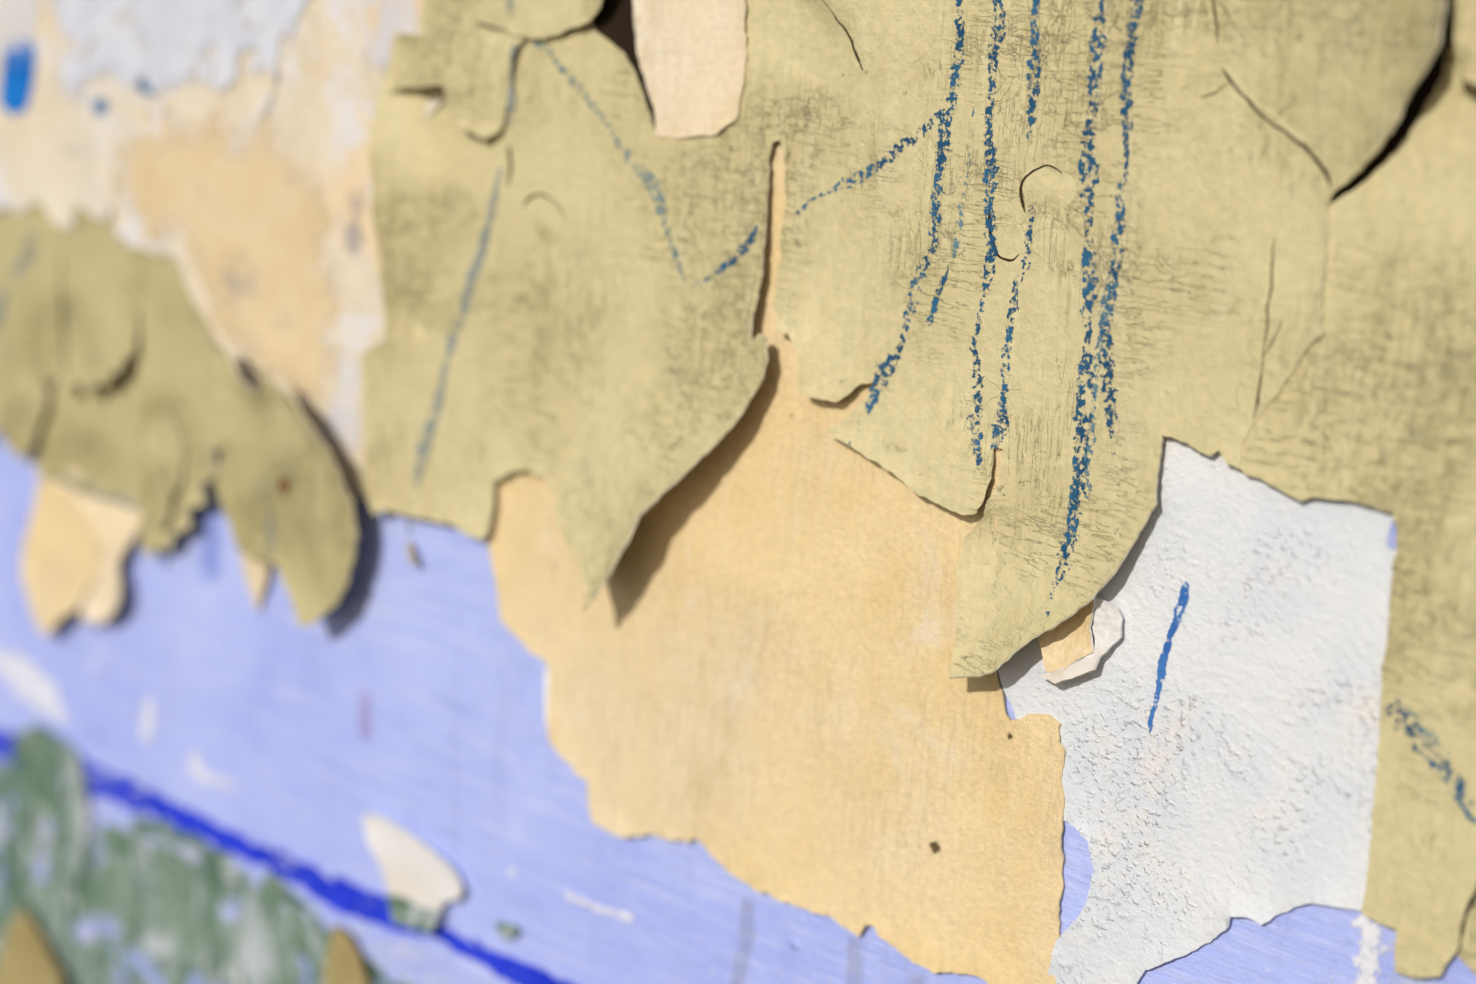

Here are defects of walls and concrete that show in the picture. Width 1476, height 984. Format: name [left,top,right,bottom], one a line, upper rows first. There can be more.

crack [1201,0,1332,189]
peeling [0,0,1446,679]
crack [1254,234,1282,416]
peeling [486,0,1476,984]
peeling [0,907,63,984]
peeling [6,724,91,890]
peeling [324,925,369,984]
peeling [363,814,463,934]
efflorescence [1351,914,1435,984]